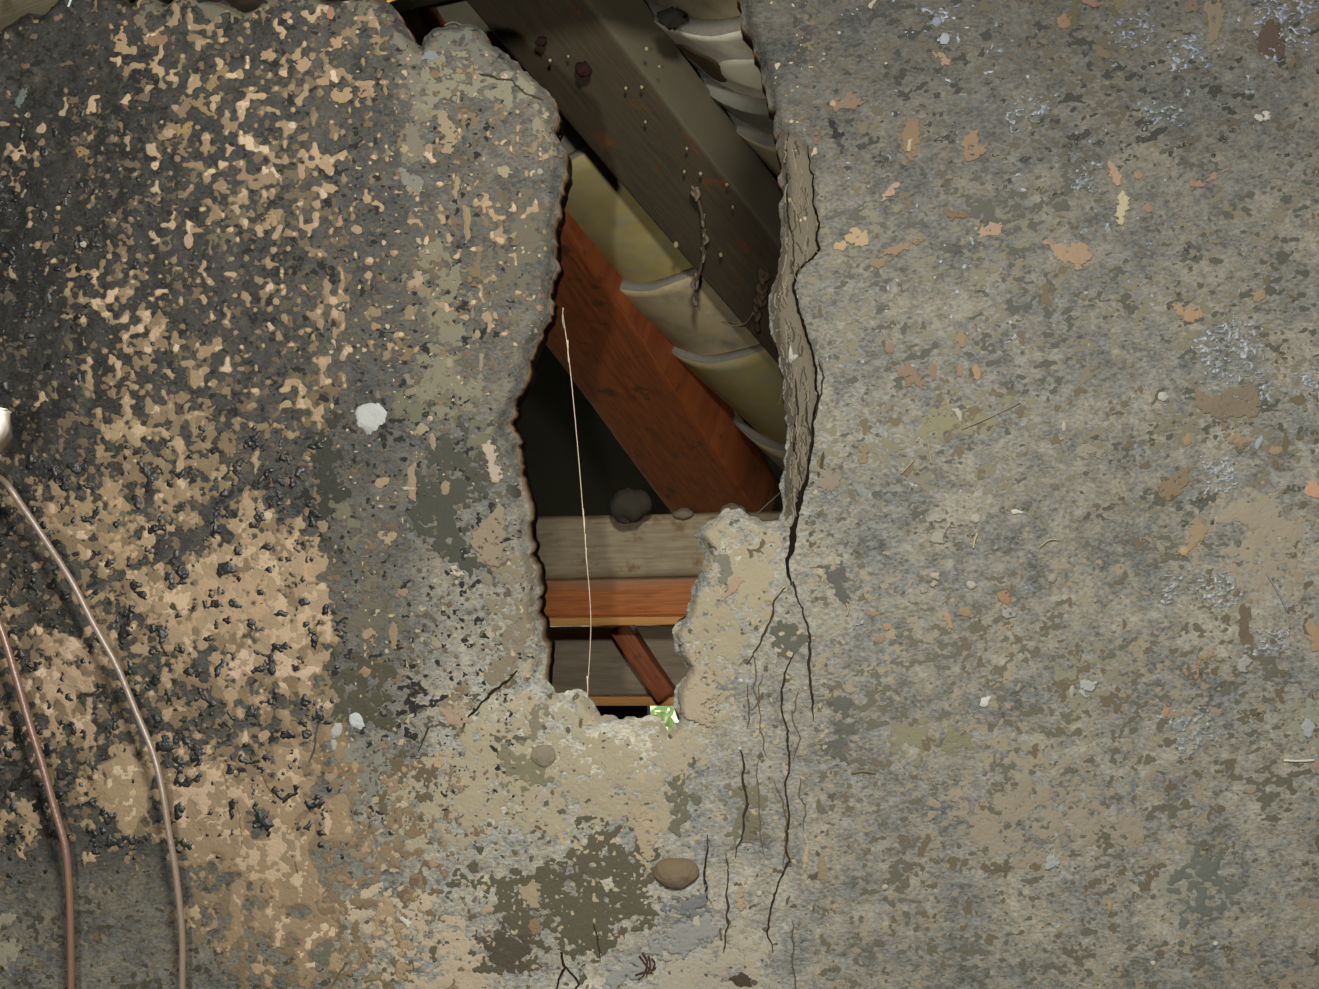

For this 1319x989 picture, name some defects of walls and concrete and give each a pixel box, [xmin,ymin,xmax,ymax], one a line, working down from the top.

peeling [0,0,669,989]
water stain [305,410,367,546]
water stain [388,399,521,585]
crack [703,132,825,989]
water stain [325,644,404,735]
water stain [495,704,569,800]
peeling [678,628,771,729]
water stain [445,762,702,985]